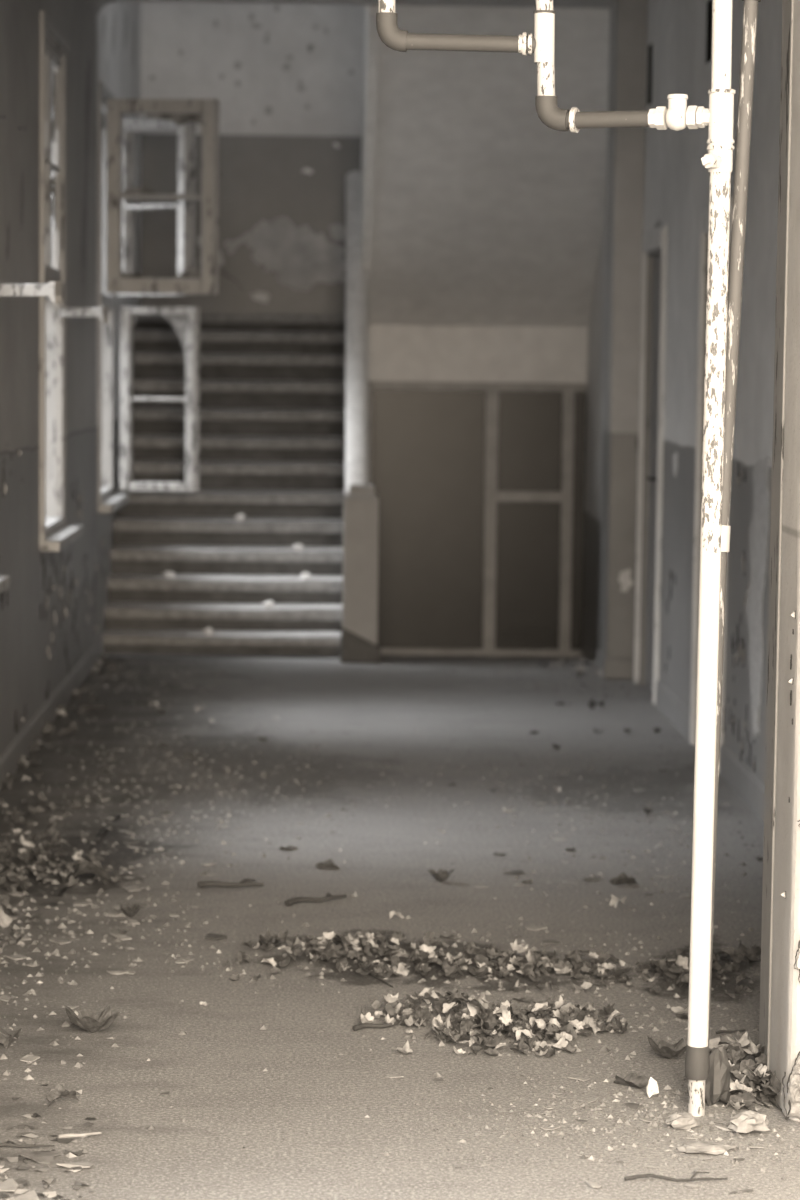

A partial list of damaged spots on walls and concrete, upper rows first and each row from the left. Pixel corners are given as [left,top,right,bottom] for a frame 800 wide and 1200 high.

peeling [722,457,770,772]
spalling [787,1055,800,1119]